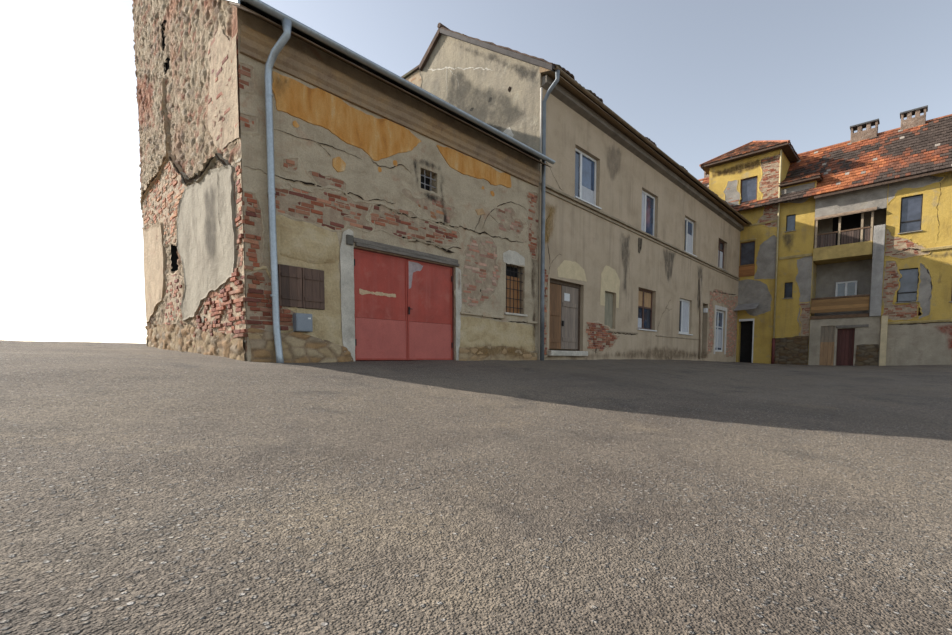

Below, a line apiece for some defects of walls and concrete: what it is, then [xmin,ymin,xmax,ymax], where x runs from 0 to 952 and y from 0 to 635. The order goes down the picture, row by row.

flaking render [207,26,260,152]
peeling [272,71,421,172]
crack [141,78,562,292]
flaking render [406,70,423,88]
peeling [437,145,512,196]
water stain [446,71,517,129]
peeling [141,155,503,343]
flaking render [526,190,549,358]
flaking render [707,153,816,358]
flaking render [881,228,934,322]
flaking render [585,320,620,354]